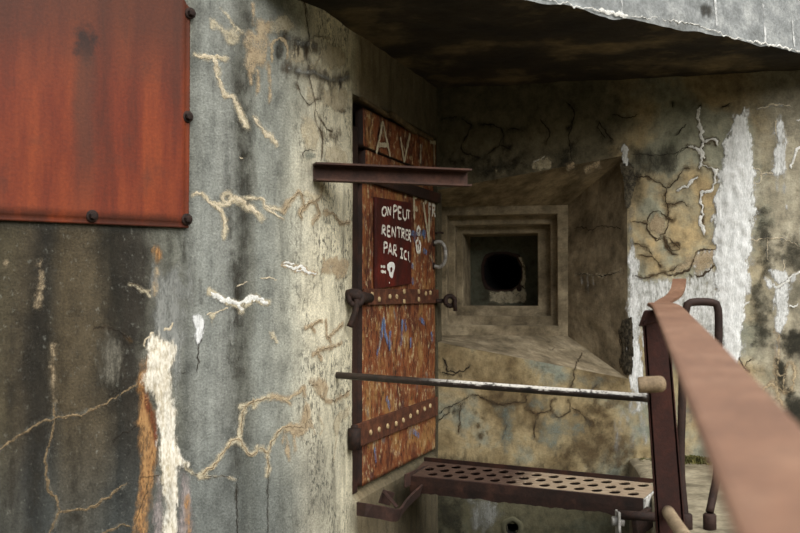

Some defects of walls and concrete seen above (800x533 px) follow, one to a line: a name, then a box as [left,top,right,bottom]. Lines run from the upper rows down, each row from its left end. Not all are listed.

crack [573,126,691,279]
water stain [773,120,787,175]
crack [0,380,140,533]
corrosion [134,357,163,533]
water stain [143,271,192,533]
corrosion [177,481,191,533]
crack [185,398,308,533]
crack [439,347,592,438]